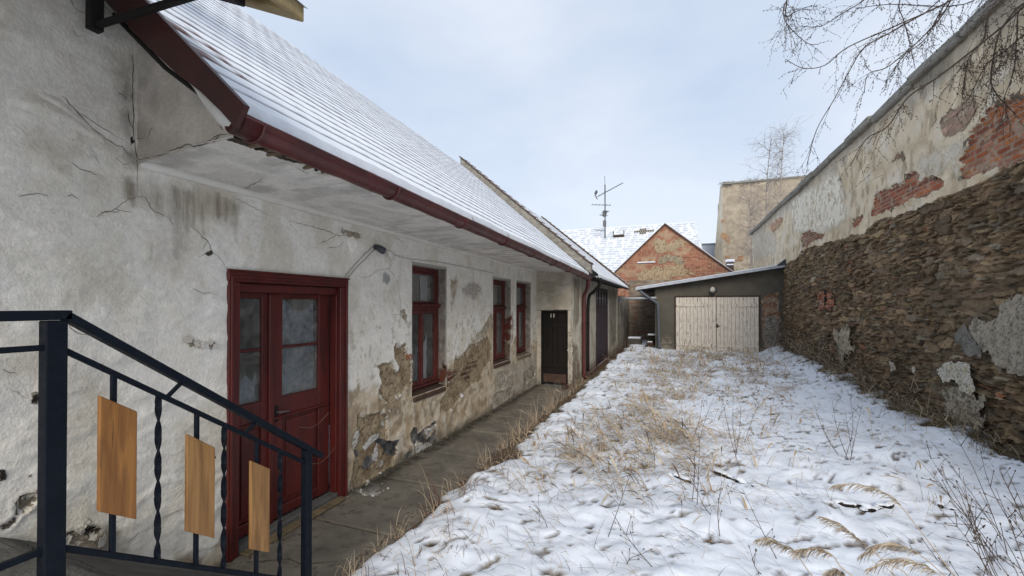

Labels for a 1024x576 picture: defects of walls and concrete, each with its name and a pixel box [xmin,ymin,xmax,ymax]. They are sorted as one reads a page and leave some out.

crack [64,55,228,268]
spalling [801,230,824,249]
flaking render [852,171,944,228]
flaking render [939,87,1024,181]
spalling [350,313,493,491]